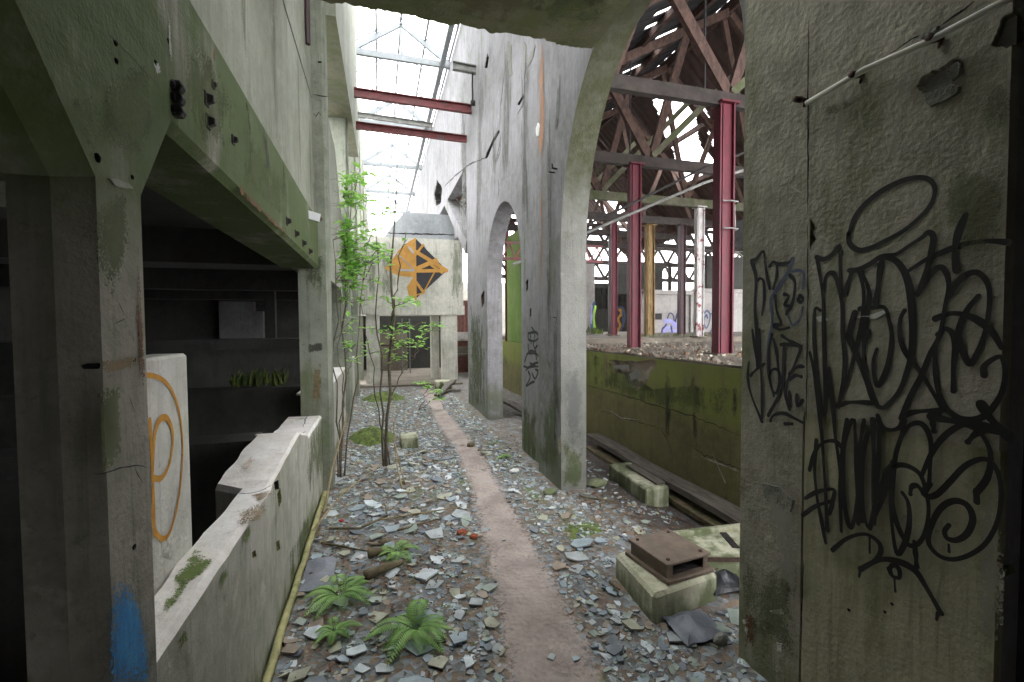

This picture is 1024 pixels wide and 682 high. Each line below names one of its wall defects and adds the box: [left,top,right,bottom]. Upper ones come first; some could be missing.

spalling [915,56,963,107]
leakage [95,193,128,295]
leakage [450,51,531,301]
crack [803,20,811,420]
spalling [610,360,656,390]
crack [798,562,806,647]